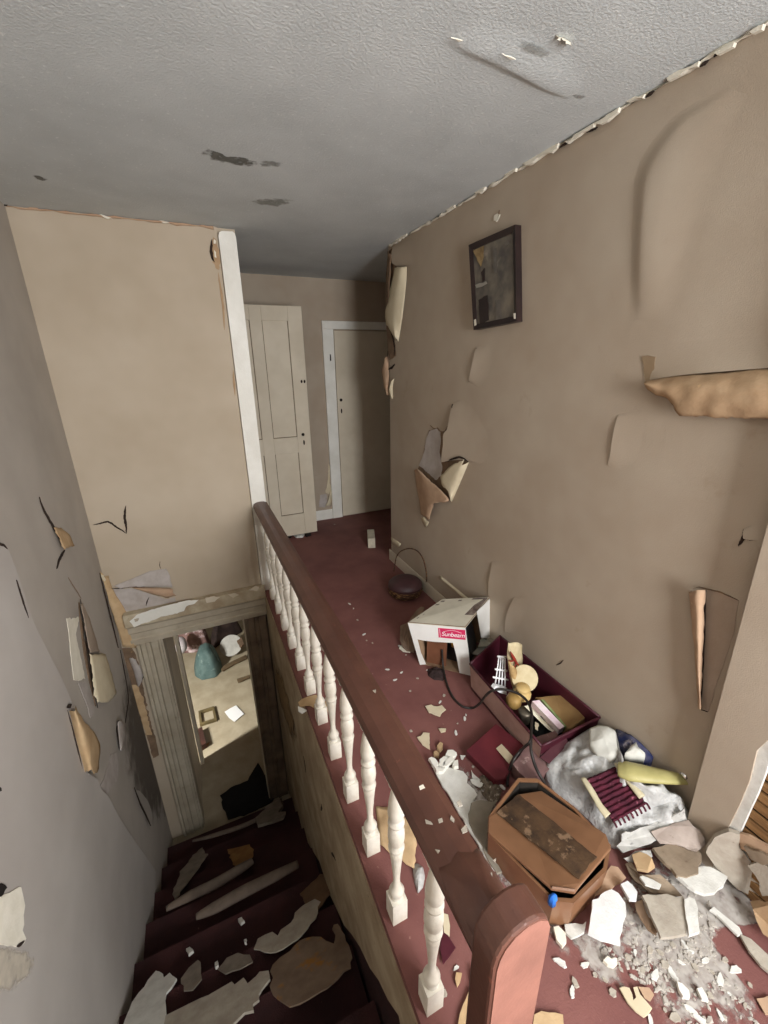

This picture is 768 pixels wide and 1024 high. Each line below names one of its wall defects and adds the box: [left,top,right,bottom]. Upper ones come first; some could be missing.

water stain [203,151,277,166]
spalling [389,20,768,246]
crack [28,497,75,569]
crack [93,504,127,534]
peeling [66,577,117,718]
peeling [100,571,260,648]
peeling [689,587,739,712]
peeling [0,883,31,989]